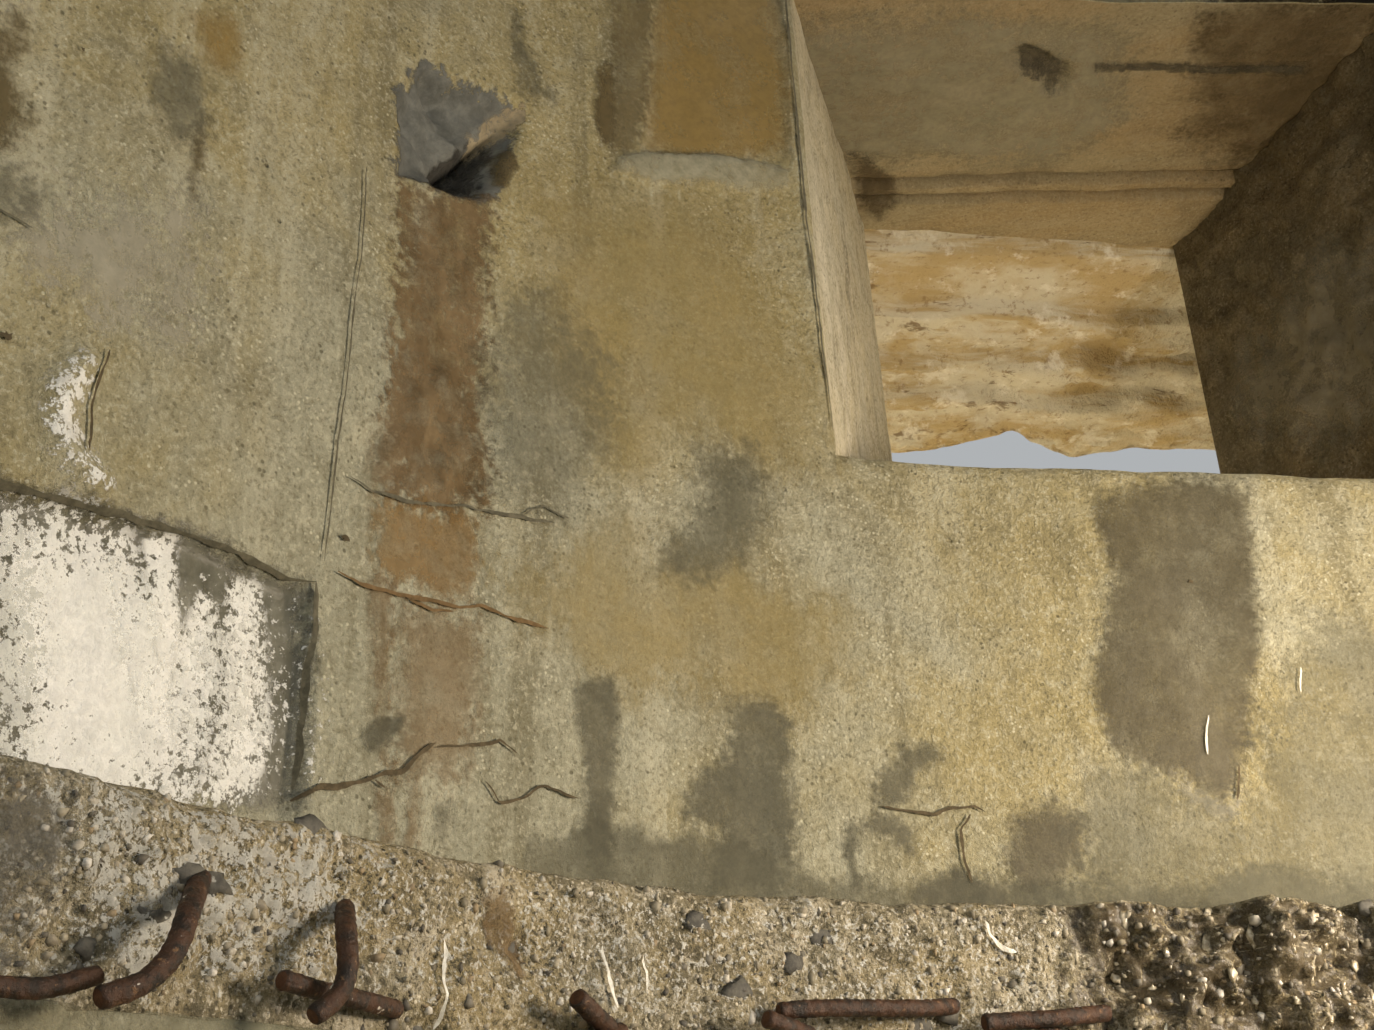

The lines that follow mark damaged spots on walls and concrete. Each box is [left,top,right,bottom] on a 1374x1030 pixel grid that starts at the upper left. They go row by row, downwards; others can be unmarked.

water stain [0,13,32,148]
water stain [154,57,204,170]
spalling [391,59,526,204]
corrosion [373,177,500,600]
crack [338,571,549,629]
crack [290,739,517,802]
crack [485,781,577,804]
crack [882,805,985,882]
spalling [0,869,212,1010]
spalling [275,899,404,1025]
corrosion [482,885,526,978]
spalling [761,998,961,1030]